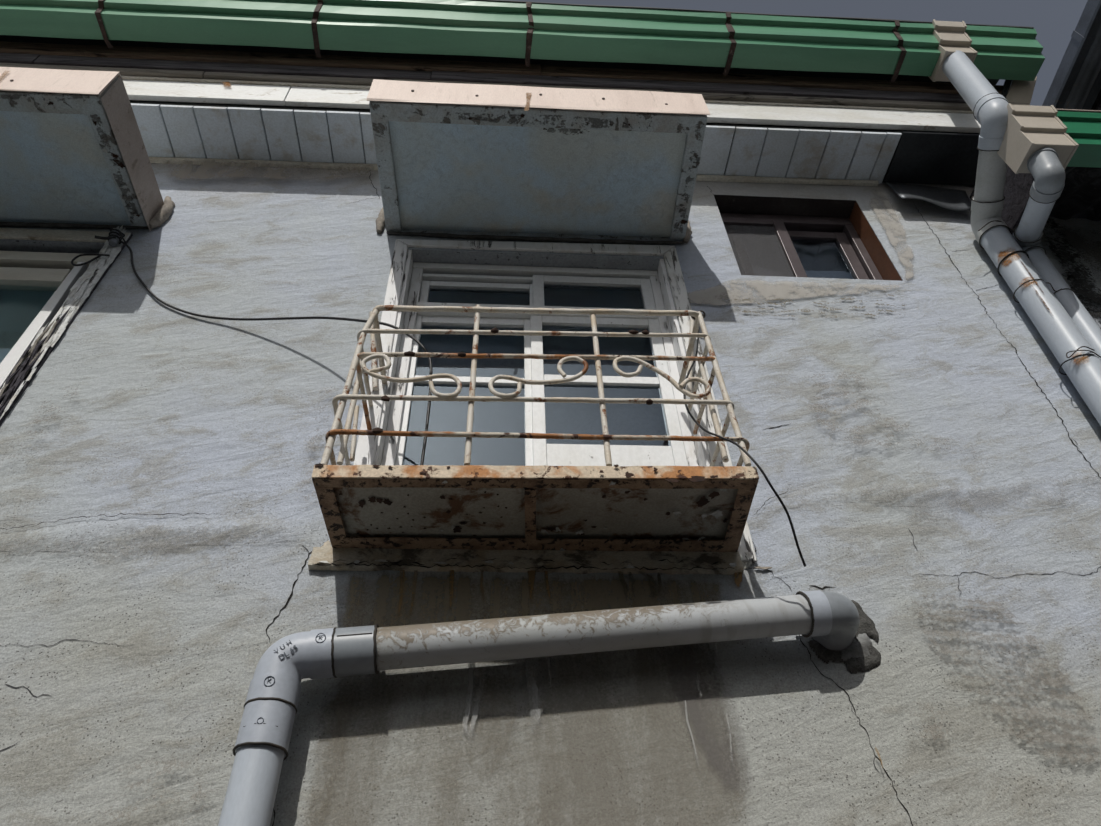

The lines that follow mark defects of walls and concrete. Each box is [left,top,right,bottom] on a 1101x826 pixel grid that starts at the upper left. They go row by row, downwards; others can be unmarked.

peeling [90,114,140,218]
peeling [446,112,651,135]
peeling [674,154,700,233]
leakage [1044,213,1101,329]
crack [915,205,1101,478]
leakage [346,572,719,627]
crack [266,540,836,642]
crack [908,528,1100,596]
leakage [524,644,741,826]
crack [799,635,913,826]